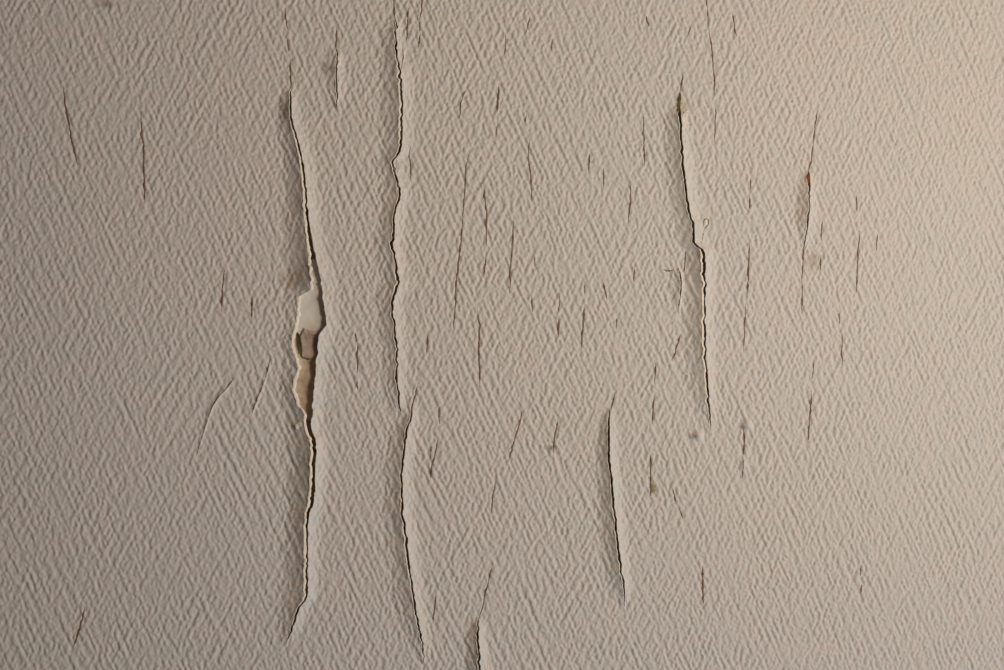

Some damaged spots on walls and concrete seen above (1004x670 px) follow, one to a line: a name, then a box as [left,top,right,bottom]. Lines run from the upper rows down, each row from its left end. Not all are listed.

flaking render [296,259,326,360]
crack [652,218,709,422]
crack [430,407,440,478]
crack [650,456,683,518]